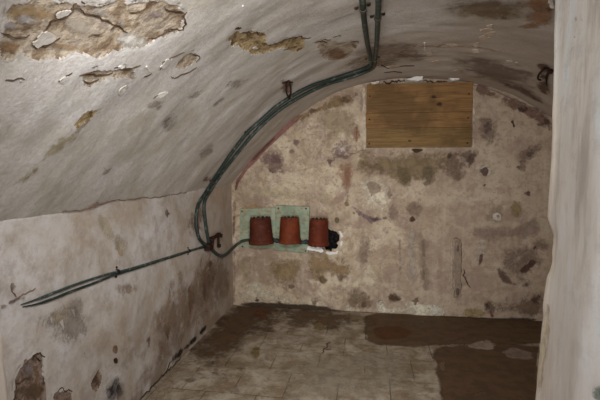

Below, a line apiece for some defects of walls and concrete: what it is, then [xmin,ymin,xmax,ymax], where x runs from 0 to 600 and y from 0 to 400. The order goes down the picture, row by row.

leakage [451,2,520,19]
peeling [0,0,192,95]
peeling [226,27,360,61]
crack [62,192,187,212]
crack [10,283,36,303]
leakage [158,239,549,400]
peeling [11,350,75,400]